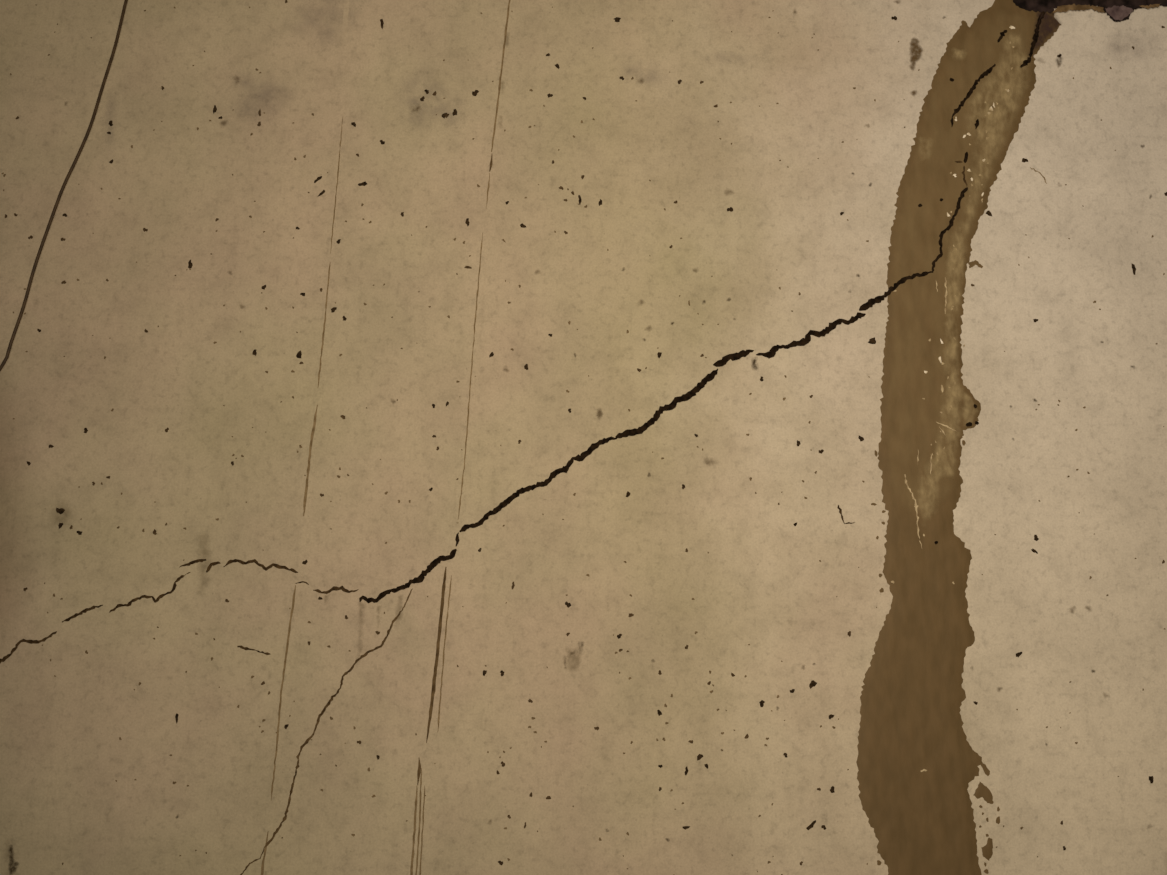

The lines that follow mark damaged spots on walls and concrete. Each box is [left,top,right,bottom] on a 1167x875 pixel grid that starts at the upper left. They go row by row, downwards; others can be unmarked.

water stain [911,39,922,68]
crack [950,30,1007,129]
crack [1020,11,1045,68]
crack [0,152,968,875]